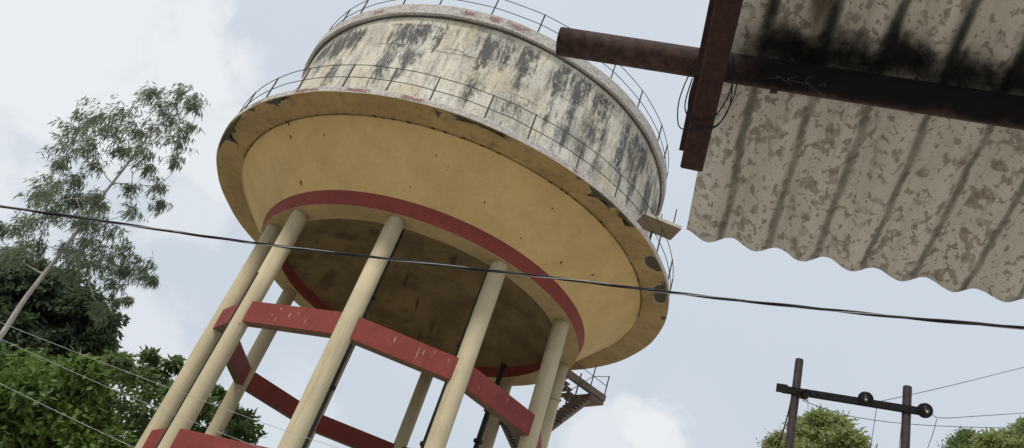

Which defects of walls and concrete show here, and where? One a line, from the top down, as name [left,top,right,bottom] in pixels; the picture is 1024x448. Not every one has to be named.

damp [312,29,368,81]
damp [373,24,442,78]
damp [475,35,539,86]
peeling [218,88,318,151]
damp [544,67,614,154]
peeling [574,168,634,227]
damp [611,122,658,214]
peeling [642,254,667,320]